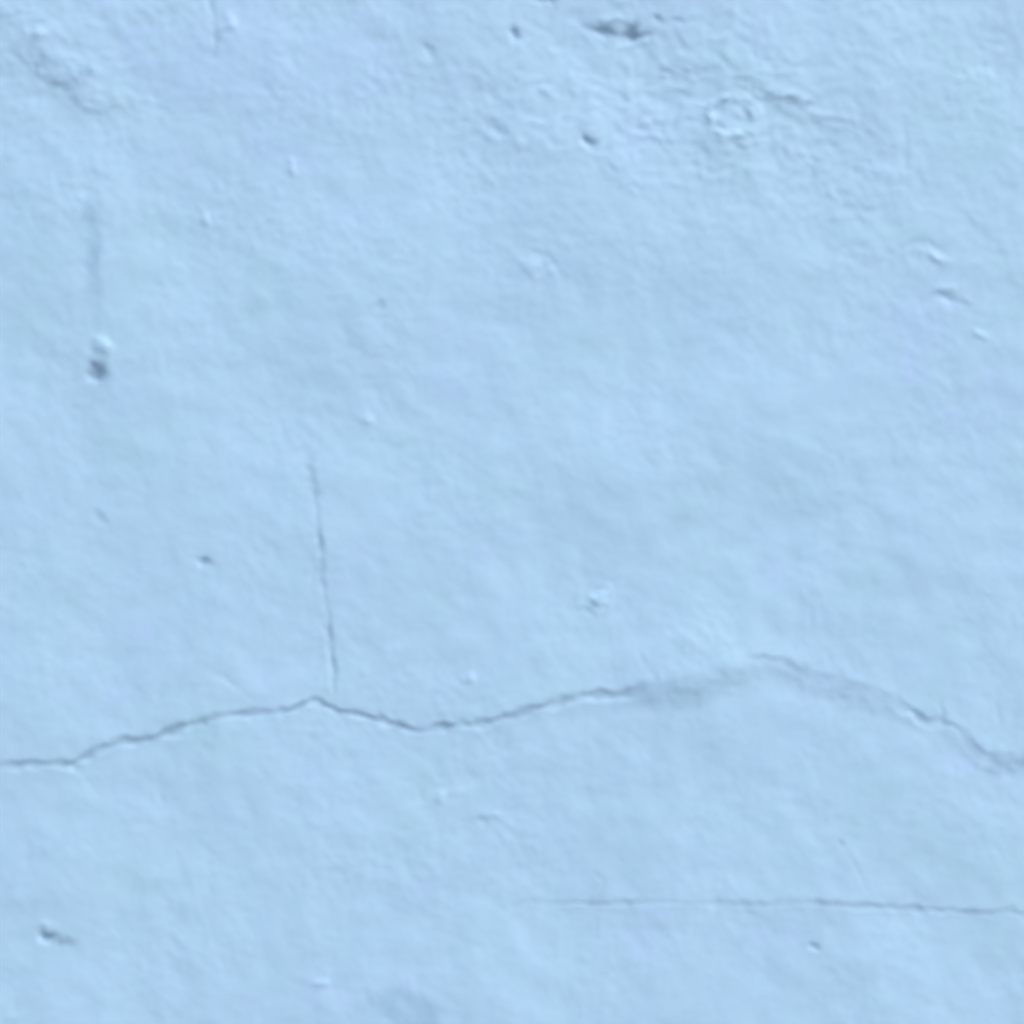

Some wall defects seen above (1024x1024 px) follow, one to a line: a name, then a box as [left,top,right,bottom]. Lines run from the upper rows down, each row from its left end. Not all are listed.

crack [0,449,1024,805]